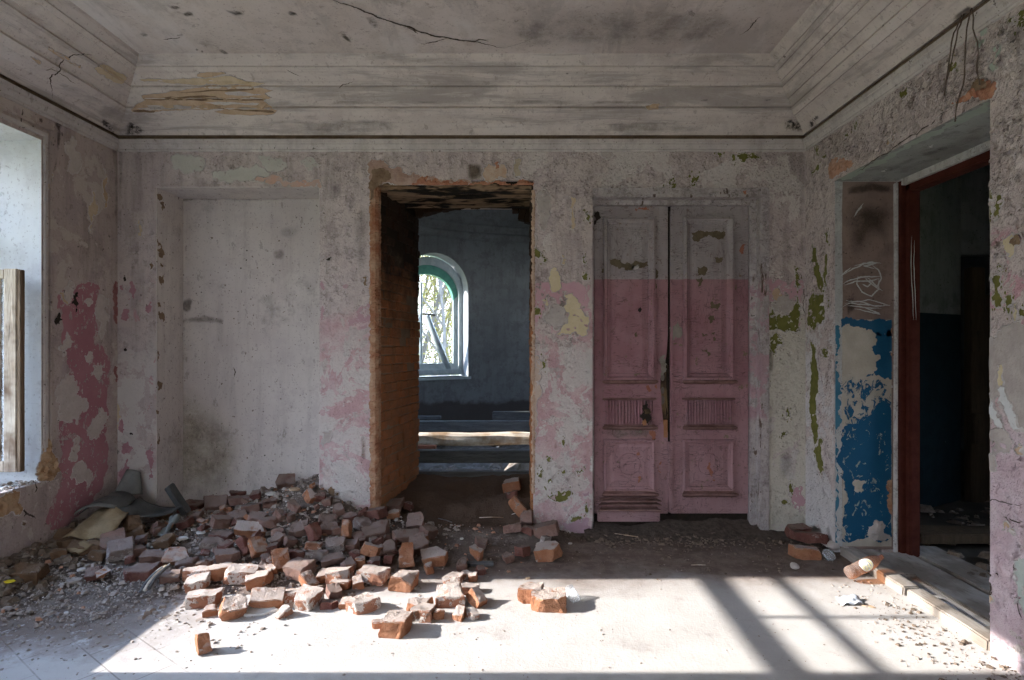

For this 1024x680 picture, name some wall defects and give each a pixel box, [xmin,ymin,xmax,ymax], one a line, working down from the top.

crack [44,54,91,96]
peeling [30,46,278,116]
crack [333,0,537,48]
flaking render [0,488,27,526]
peeling [35,277,136,530]
flaking render [348,158,593,544]
peeling [769,228,893,547]
peeling [950,6,1024,483]